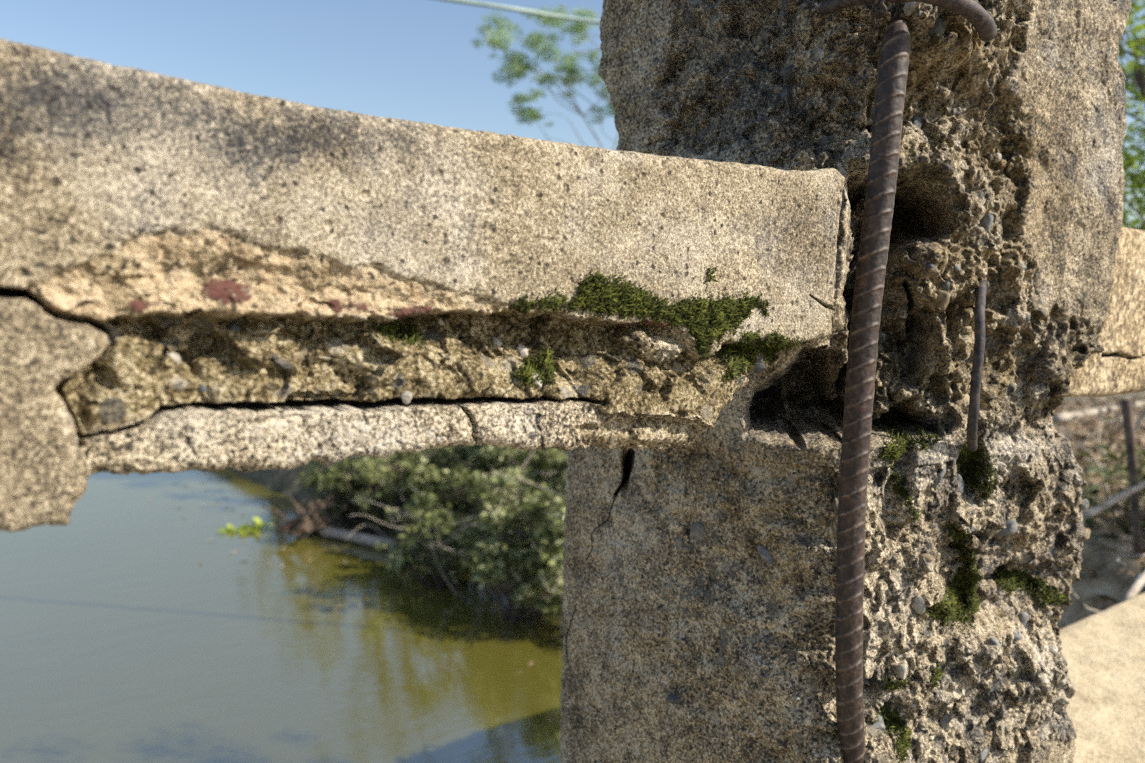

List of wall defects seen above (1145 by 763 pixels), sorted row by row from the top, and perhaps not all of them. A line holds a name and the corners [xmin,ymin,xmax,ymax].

crack [0,288,36,303]
crack [93,396,595,444]
spalling [22,225,778,450]
spalling [626,0,1105,763]
crack [586,448,635,560]